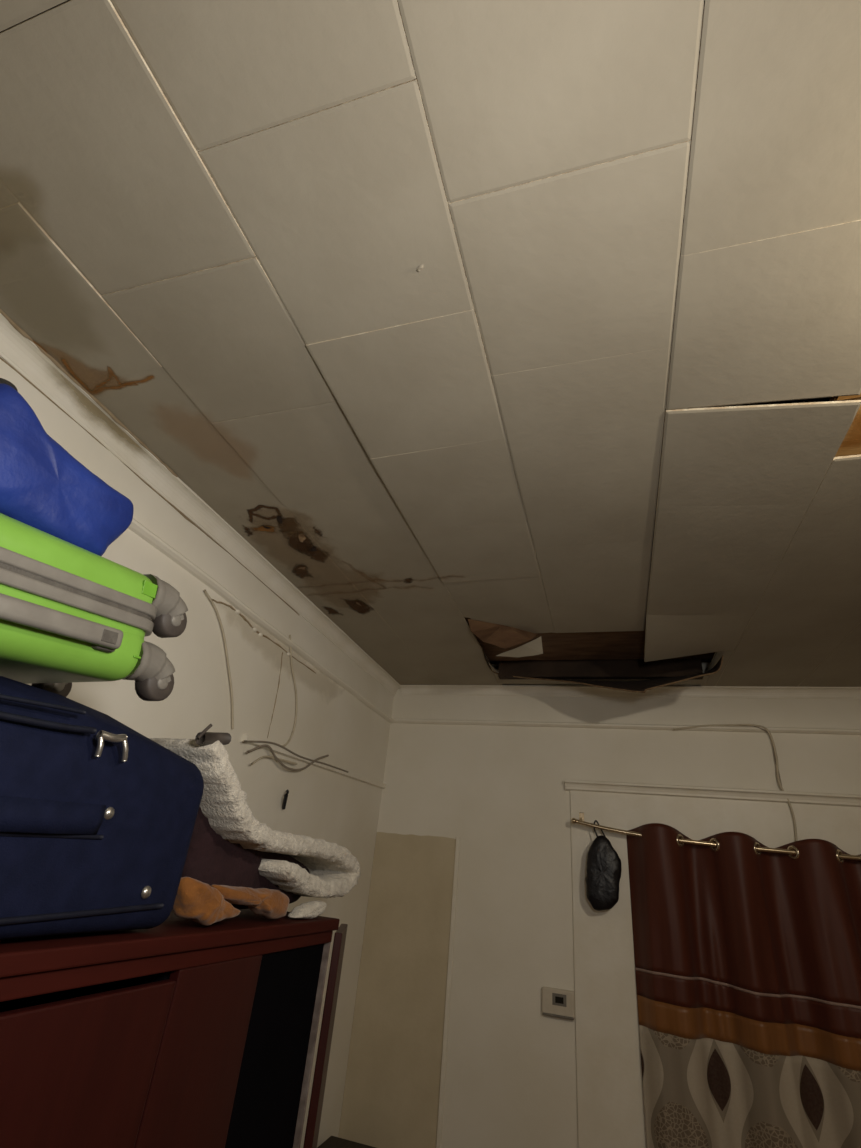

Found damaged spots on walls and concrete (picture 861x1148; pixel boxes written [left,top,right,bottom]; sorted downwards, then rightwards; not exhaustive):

damp [243,505,328,578]
damp [324,599,373,615]